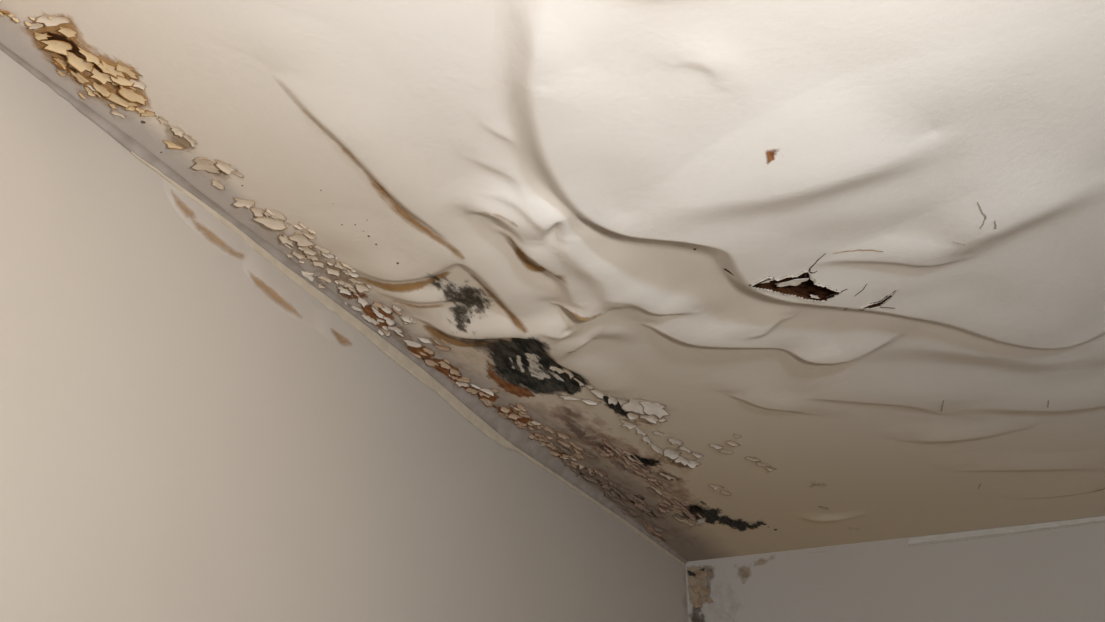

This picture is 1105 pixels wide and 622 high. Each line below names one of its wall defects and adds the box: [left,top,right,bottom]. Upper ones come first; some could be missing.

water stain [369,176,463,258]
peeling [0,9,777,542]
water stain [511,240,562,279]
water stain [359,272,587,397]
water stain [624,453,666,475]
water stain [682,502,777,532]
spalling [687,566,714,622]